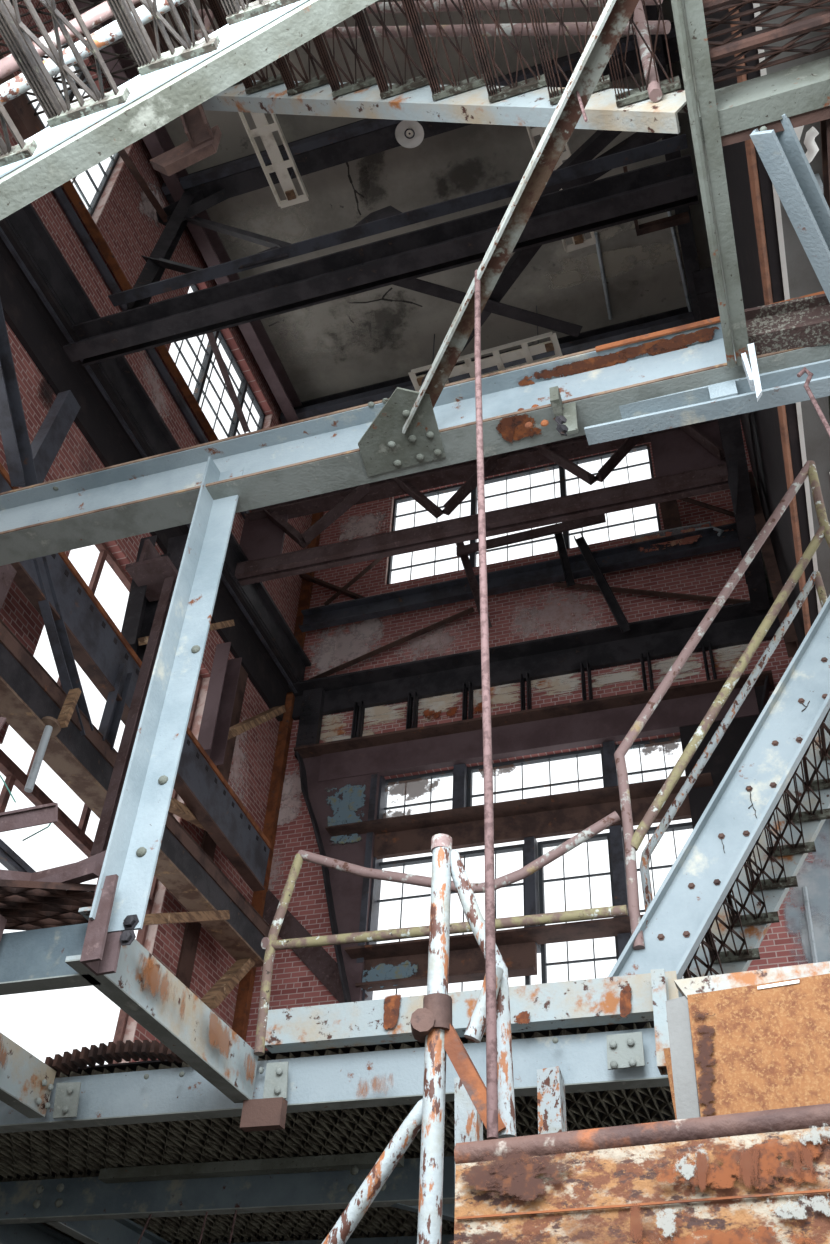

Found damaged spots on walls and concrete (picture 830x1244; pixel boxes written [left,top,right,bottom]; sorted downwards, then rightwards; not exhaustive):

rust [518,326,719,386]
rust [496,413,542,442]
peeling [326,783,366,844]
rust [140,954,185,1017]
rust [383,994,401,1029]
rust [514,1011,530,1024]
rust [620,981,632,1018]
rust [665,961,830,1120]
rust [461,1148,575,1201]
rust [654,1135,830,1191]
rust [451,1232,551,1244]
rust [630,1204,816,1244]